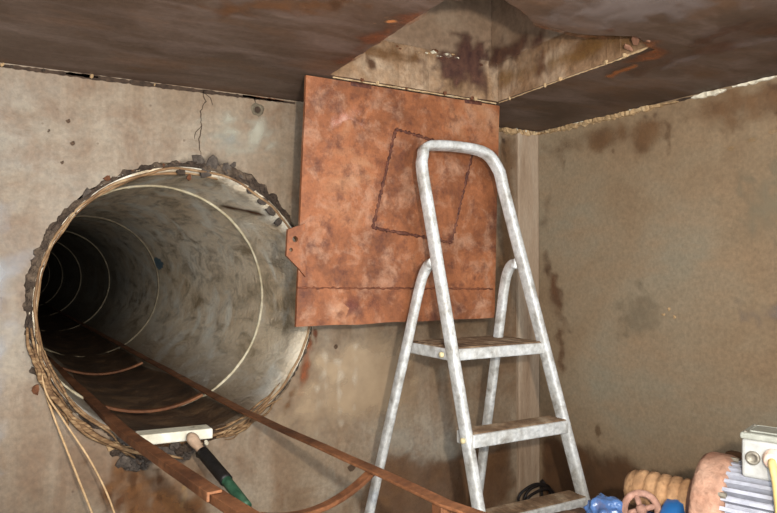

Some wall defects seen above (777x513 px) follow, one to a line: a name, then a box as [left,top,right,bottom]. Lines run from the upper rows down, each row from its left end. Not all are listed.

leakage [438,33,543,90]
spalling [333,36,650,104]
crack [0,64,295,152]